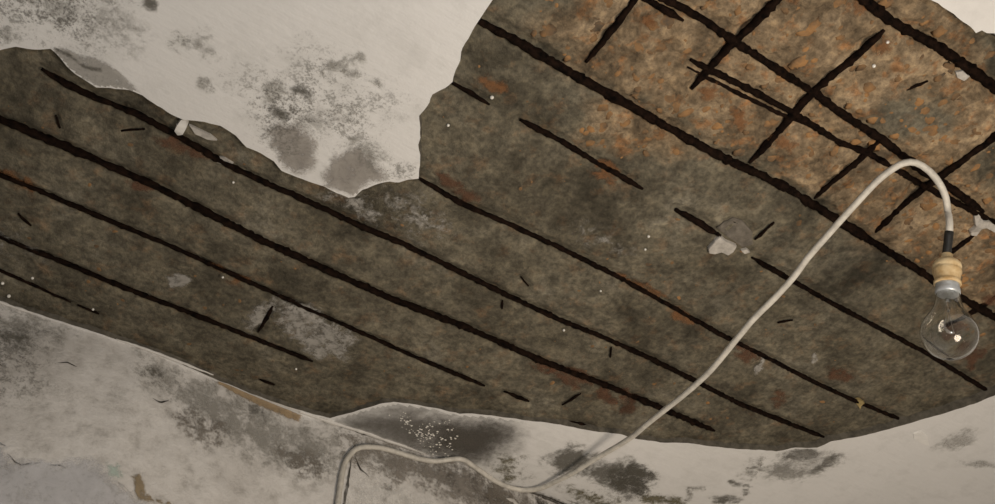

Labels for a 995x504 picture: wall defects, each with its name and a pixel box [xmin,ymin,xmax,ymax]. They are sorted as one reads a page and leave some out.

water stain [267,83,309,119]
spalling [0,0,901,436]
spalling [635,0,995,451]
water stain [250,303,354,359]
water stain [178,383,701,504]
water stain [714,449,839,504]